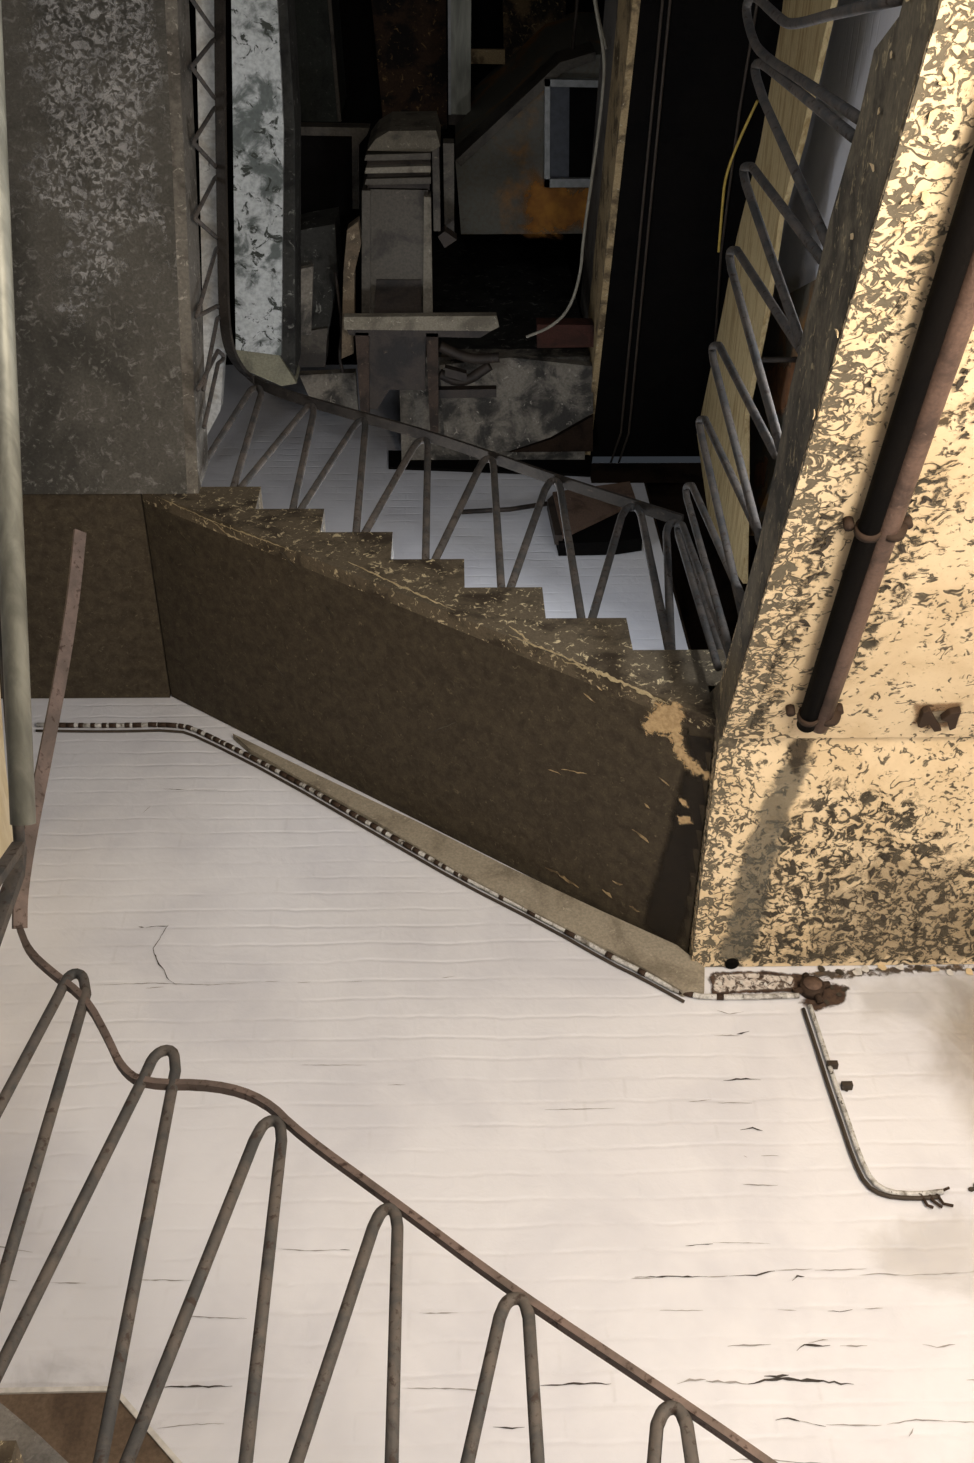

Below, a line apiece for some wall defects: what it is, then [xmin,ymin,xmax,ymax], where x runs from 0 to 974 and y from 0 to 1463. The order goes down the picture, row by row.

rust [524,177,589,235]
peeling [640,701,711,780]
peeling [677,798,693,825]
crack [111,926,305,988]
crack [631,1242,974,1385]
crack [410,1385,492,1393]
crack [541,1380,607,1388]
crack [777,1417,972,1436]
crack [731,1455,818,1463]